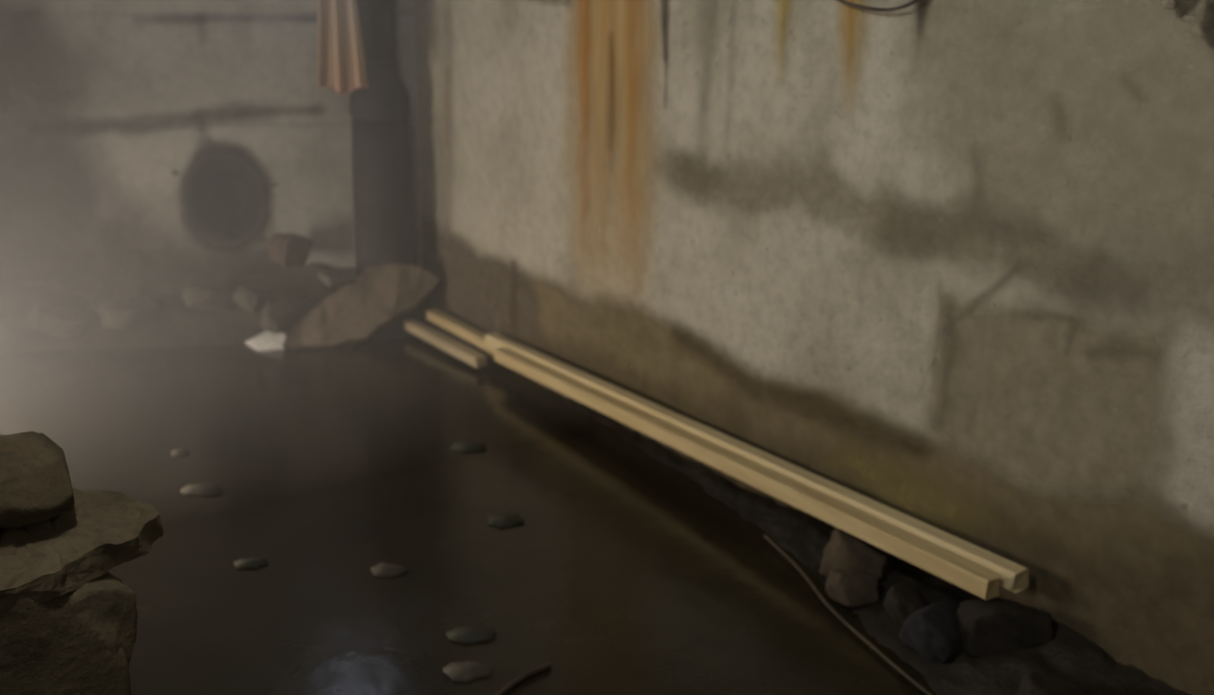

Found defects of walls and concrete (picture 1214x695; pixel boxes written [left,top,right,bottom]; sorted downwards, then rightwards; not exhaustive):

corrosion [577,0,650,220]
spalling [1161,0,1214,46]
damp [422,139,1214,695]